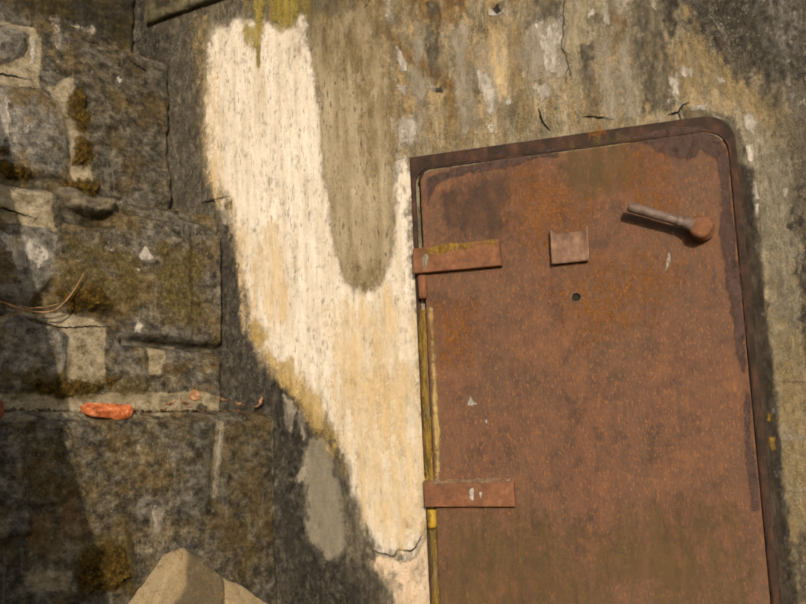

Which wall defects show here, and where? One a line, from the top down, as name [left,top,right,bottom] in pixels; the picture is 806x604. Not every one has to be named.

water stain [445,22,526,139]
spalling [488,3,505,16]
crack [561,0,572,83]
peeling [524,0,610,101]
water stain [579,0,680,119]
water stain [690,0,806,110]
water stain [136,0,440,604]
water stain [733,144,806,604]
crack [372,527,426,558]